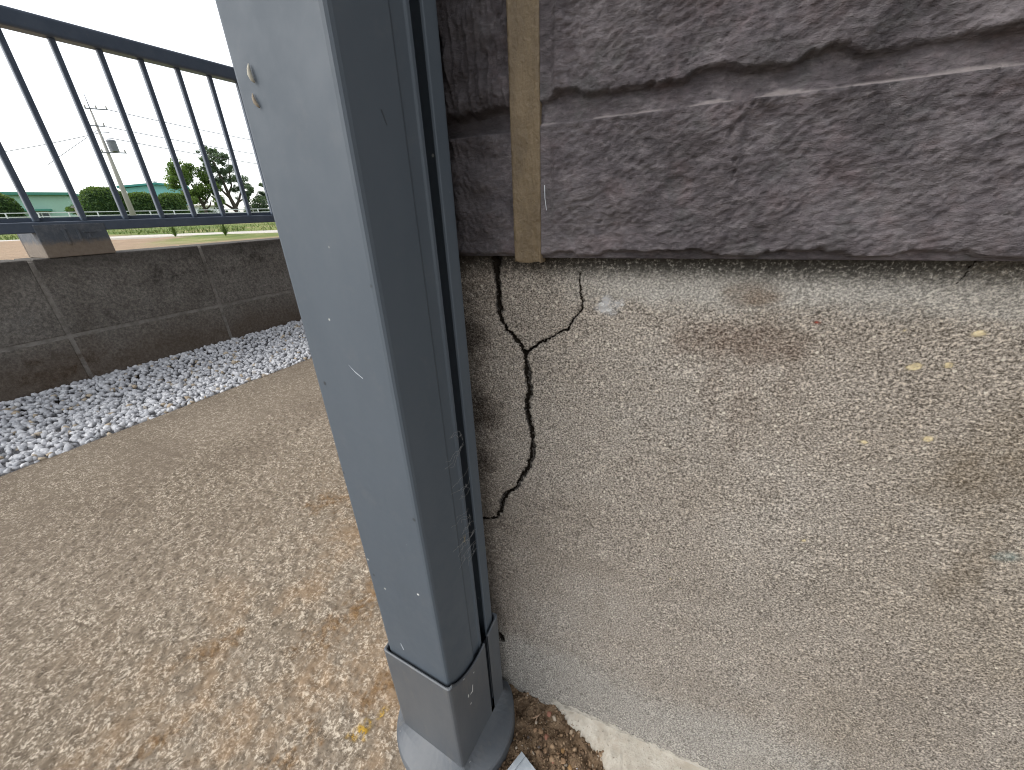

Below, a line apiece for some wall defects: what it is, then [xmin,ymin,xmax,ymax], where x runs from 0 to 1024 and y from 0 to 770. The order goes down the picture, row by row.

crack [483,256,584,519]